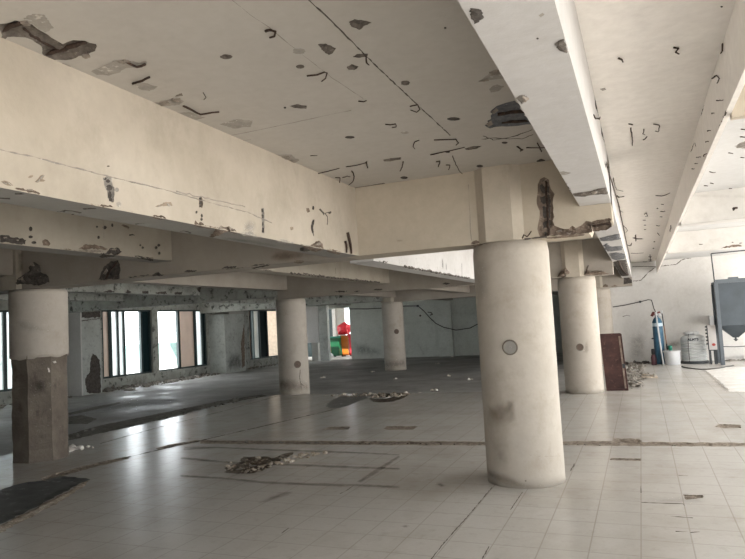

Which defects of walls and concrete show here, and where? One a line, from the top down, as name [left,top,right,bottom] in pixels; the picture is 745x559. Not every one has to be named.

spalling [0,14,97,67]
spalling [349,19,371,30]
spalling [469,8,484,24]
peeling [91,59,147,76]
spalling [485,95,531,128]
crack [484,130,531,140]
spalling [91,176,119,209]
crack [0,149,272,223]
crack [57,208,104,231]
spalling [522,162,642,284]
spalling [74,244,122,280]
spalling [85,354,101,394]